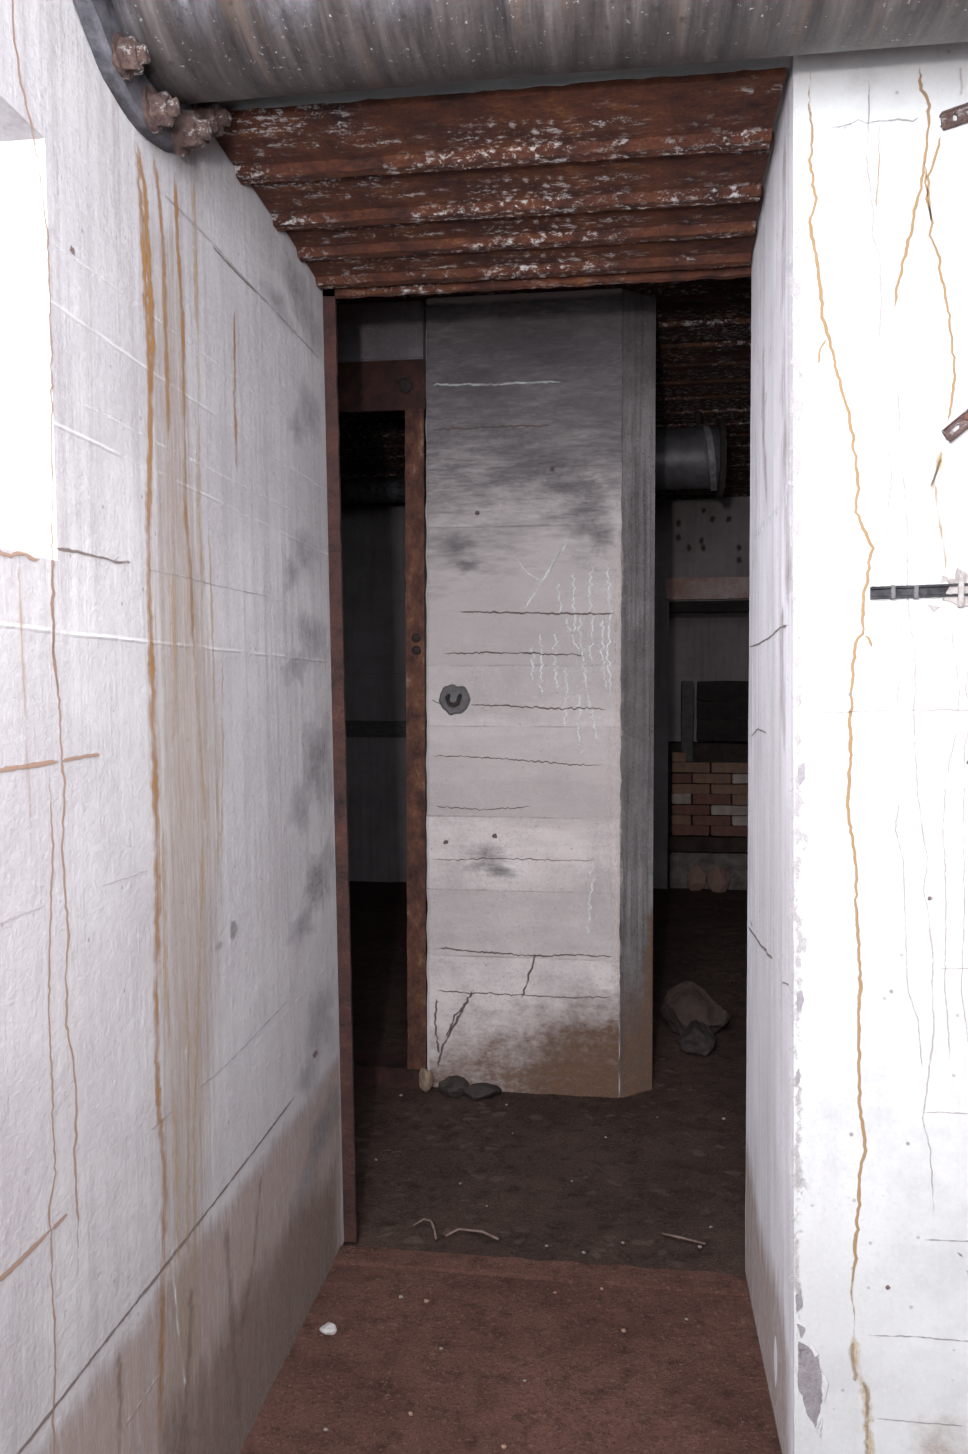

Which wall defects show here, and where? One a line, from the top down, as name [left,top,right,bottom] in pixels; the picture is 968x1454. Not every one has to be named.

crack [0,0,291,1454]
rust [138,149,214,1254]
crack [808,74,968,1314]
crack [434,947,609,1064]
damp [431,915,653,1098]
peeling [795,1289,828,1436]
crack [886,1418,960,1426]
crack [883,1334,968,1342]